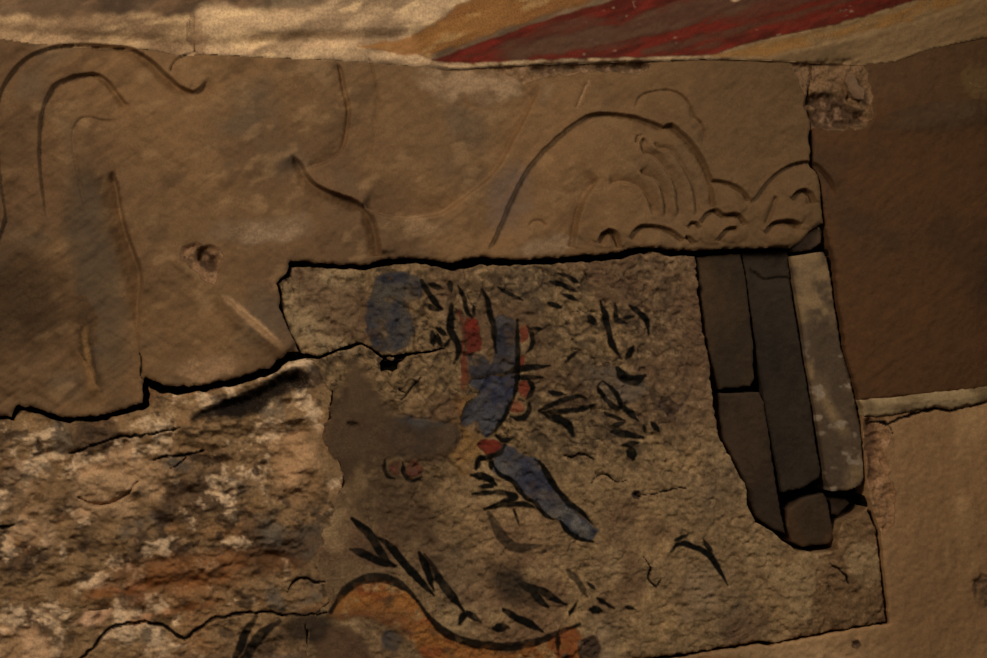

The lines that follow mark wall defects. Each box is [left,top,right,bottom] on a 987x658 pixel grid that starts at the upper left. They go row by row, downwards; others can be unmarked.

spalling [791,63,874,131]
crack [276,247,780,319]
crack [0,342,442,469]
crack [81,577,325,658]